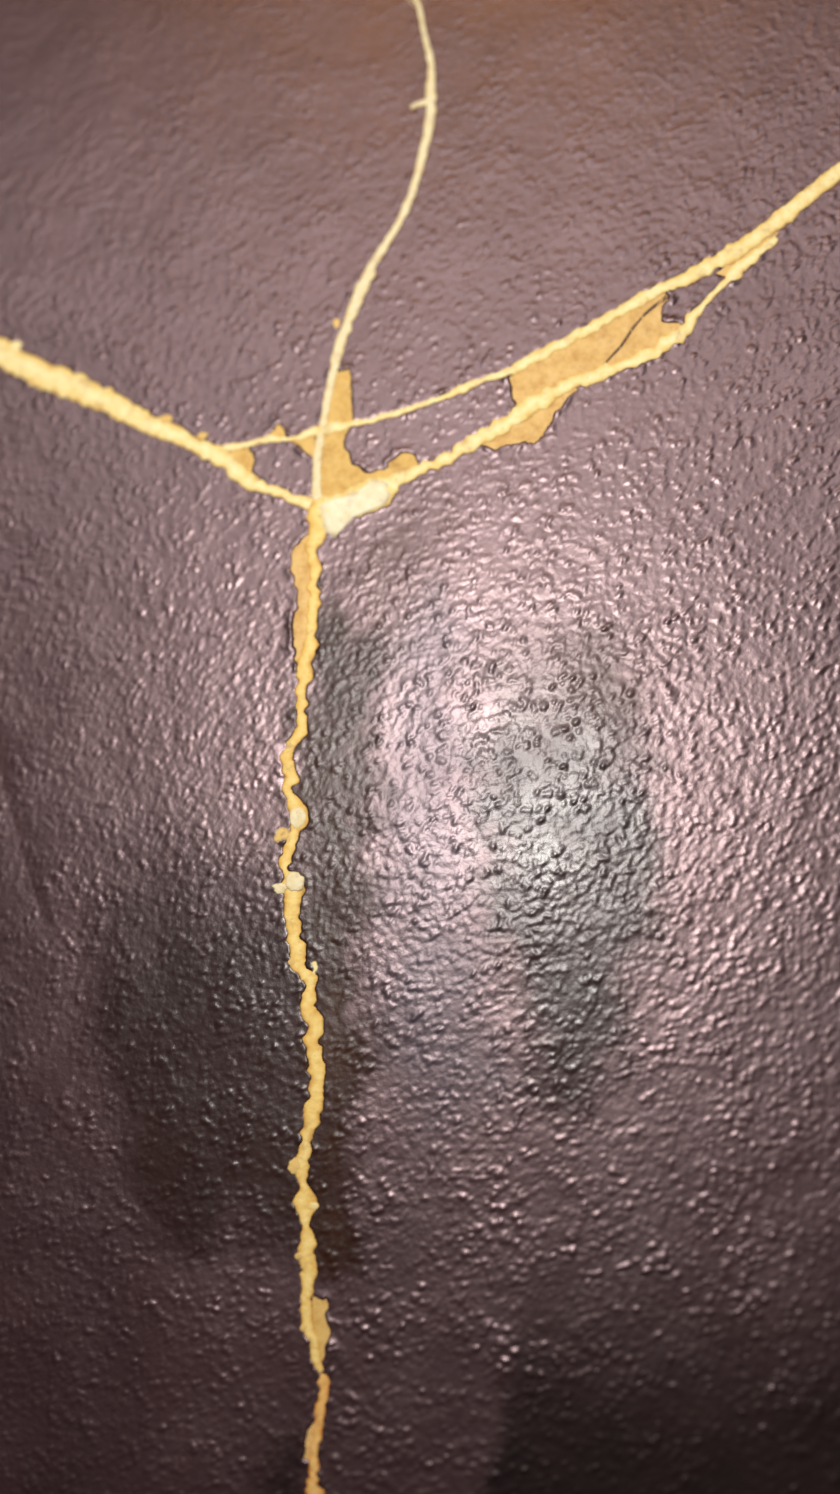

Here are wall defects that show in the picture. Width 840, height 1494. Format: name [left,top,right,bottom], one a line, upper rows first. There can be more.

peeling [268,369,418,497]
crack [0,0,840,510]
peeling [482,294,681,449]
crack [271,235,779,1373]
water stain [480,715,655,1101]
water stain [101,921,324,1236]
crack [305,1374,330,1494]